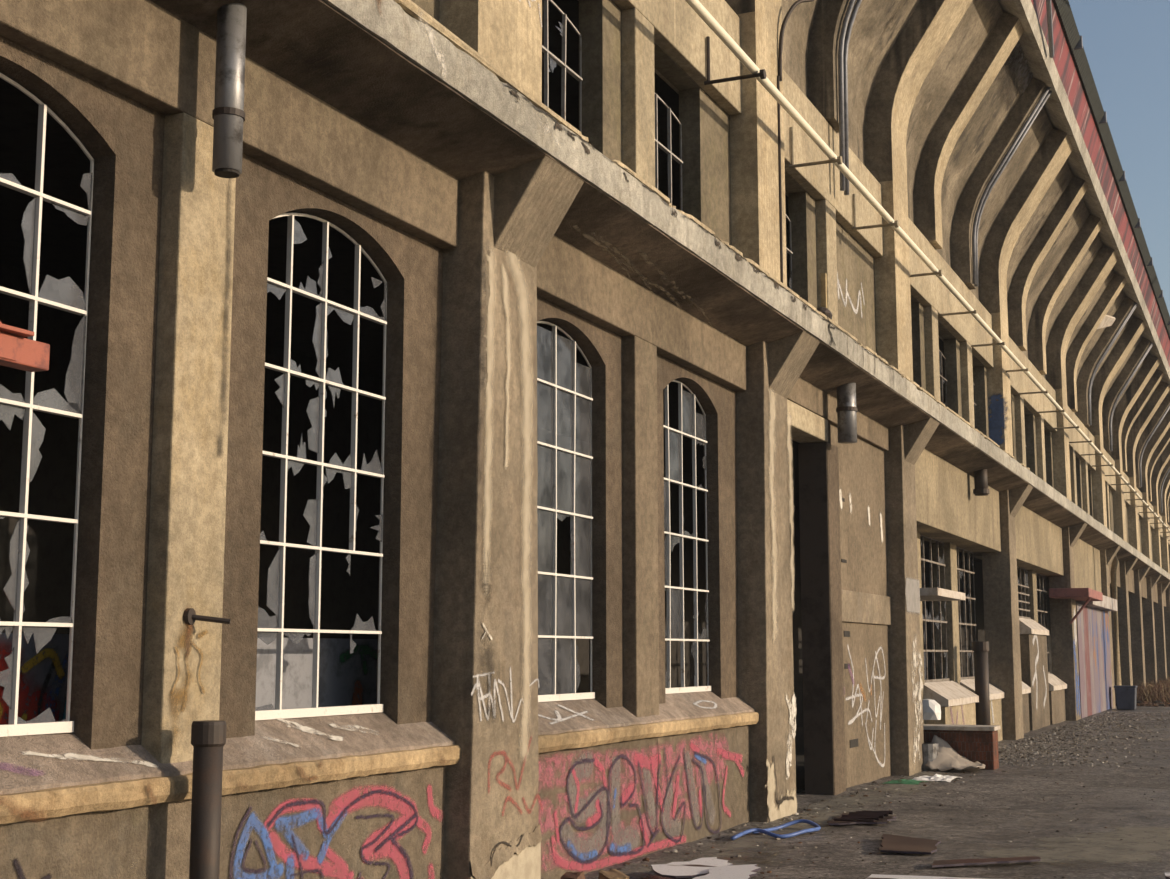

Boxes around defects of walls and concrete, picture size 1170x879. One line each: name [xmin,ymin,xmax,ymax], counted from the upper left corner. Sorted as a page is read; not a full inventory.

damp [478,252,531,757]
flaking render [765,694,797,822]
flaking render [470,824,542,879]
spalling [561,871,585,879]